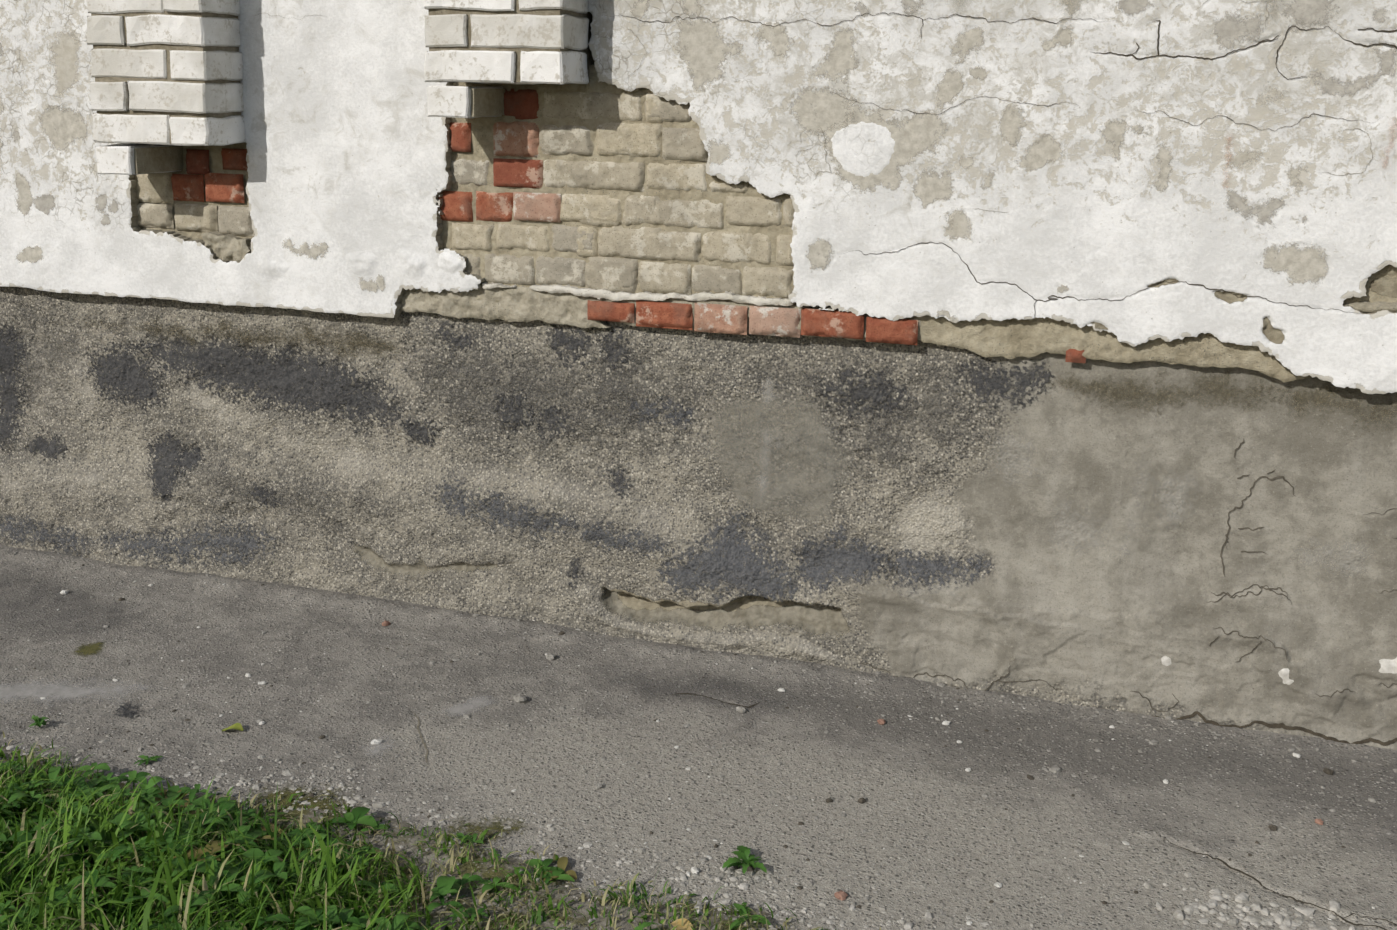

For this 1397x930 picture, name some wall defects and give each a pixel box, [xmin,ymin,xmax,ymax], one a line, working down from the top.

crack [1136,110,1384,176]
spalling [130,143,255,262]
spalling [400,0,1311,382]
crack [855,242,1361,317]
peeling [1260,243,1328,284]
spalling [1342,265,1397,313]
leakage [88,324,440,446]
leakage [146,429,203,502]
leakage [0,514,276,569]
leakage [434,476,992,603]
crack [1210,438,1295,662]
crack [1130,691,1397,746]